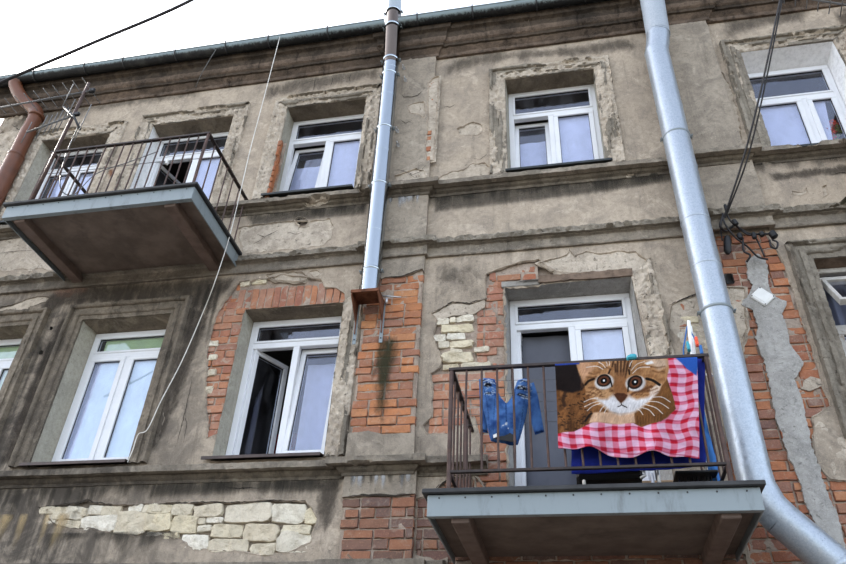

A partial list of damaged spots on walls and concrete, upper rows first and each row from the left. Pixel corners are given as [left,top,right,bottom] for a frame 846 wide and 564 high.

peeling [394,75,441,181]
peeling [237,216,334,255]
peeling [0,296,49,311]
flaking render [203,269,345,439]
flaking render [350,249,648,488]
spalling [668,295,710,362]
flaking render [714,230,846,549]
spalling [37,498,319,557]
flaking render [338,494,472,564]
flaking render [721,522,805,564]